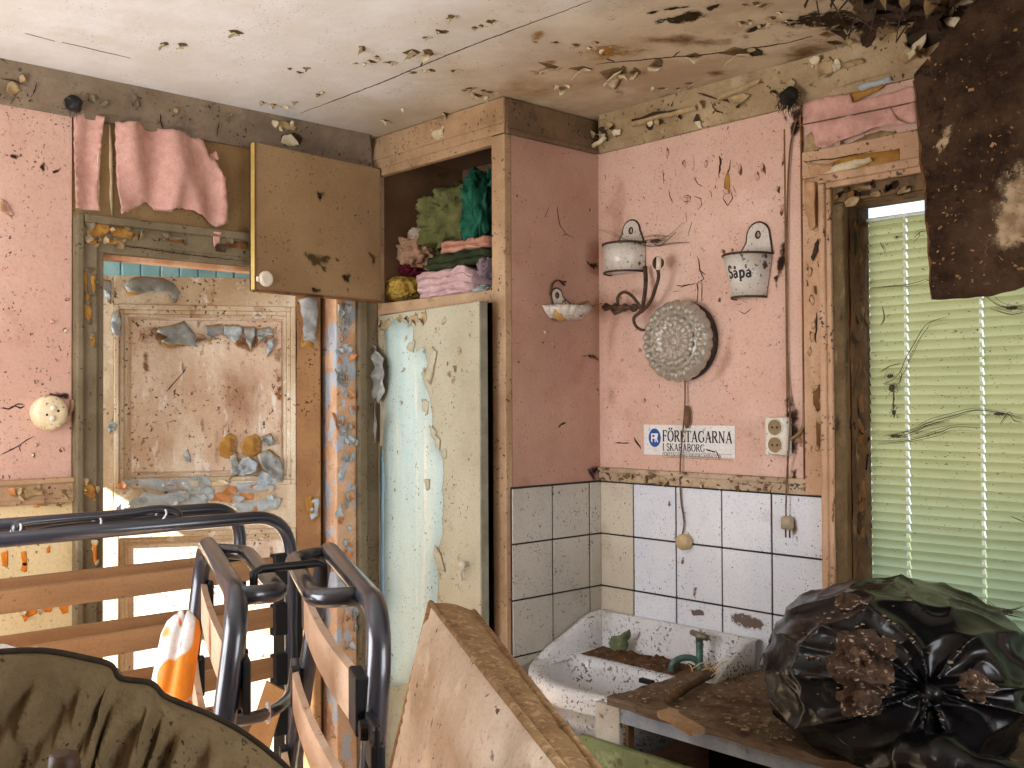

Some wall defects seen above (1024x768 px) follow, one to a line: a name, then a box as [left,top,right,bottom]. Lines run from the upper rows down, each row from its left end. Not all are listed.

peeling [352,15,458,75]
peeling [538,41,663,95]
water stain [646,4,720,43]
water stain [792,47,822,61]
water stain [782,9,864,31]
peeling [850,77,893,103]
peeling [85,222,144,249]
peeling [84,268,181,348]
peeling [156,321,274,357]
peeling [332,302,358,559]
peeling [116,433,284,512]
peeling [370,310,462,691]